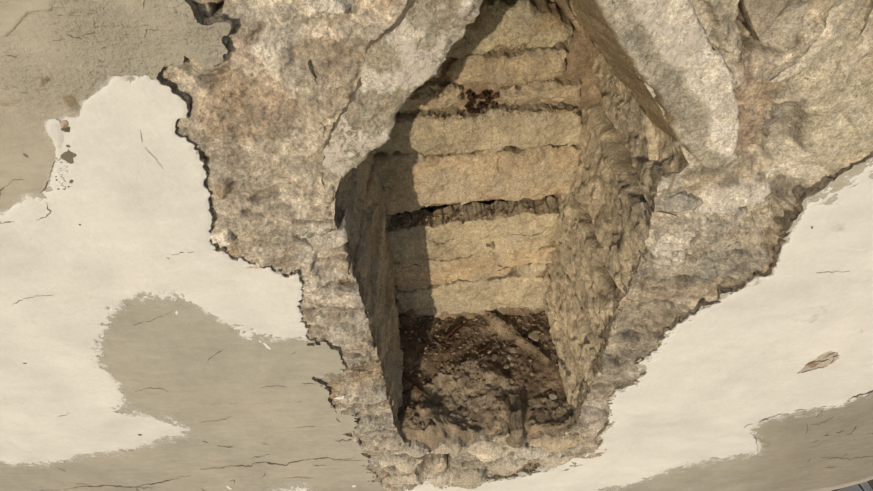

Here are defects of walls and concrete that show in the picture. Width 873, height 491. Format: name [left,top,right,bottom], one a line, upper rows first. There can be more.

peeling [0,75,309,467]
crack [44,407,362,491]
peeling [410,159,873,491]